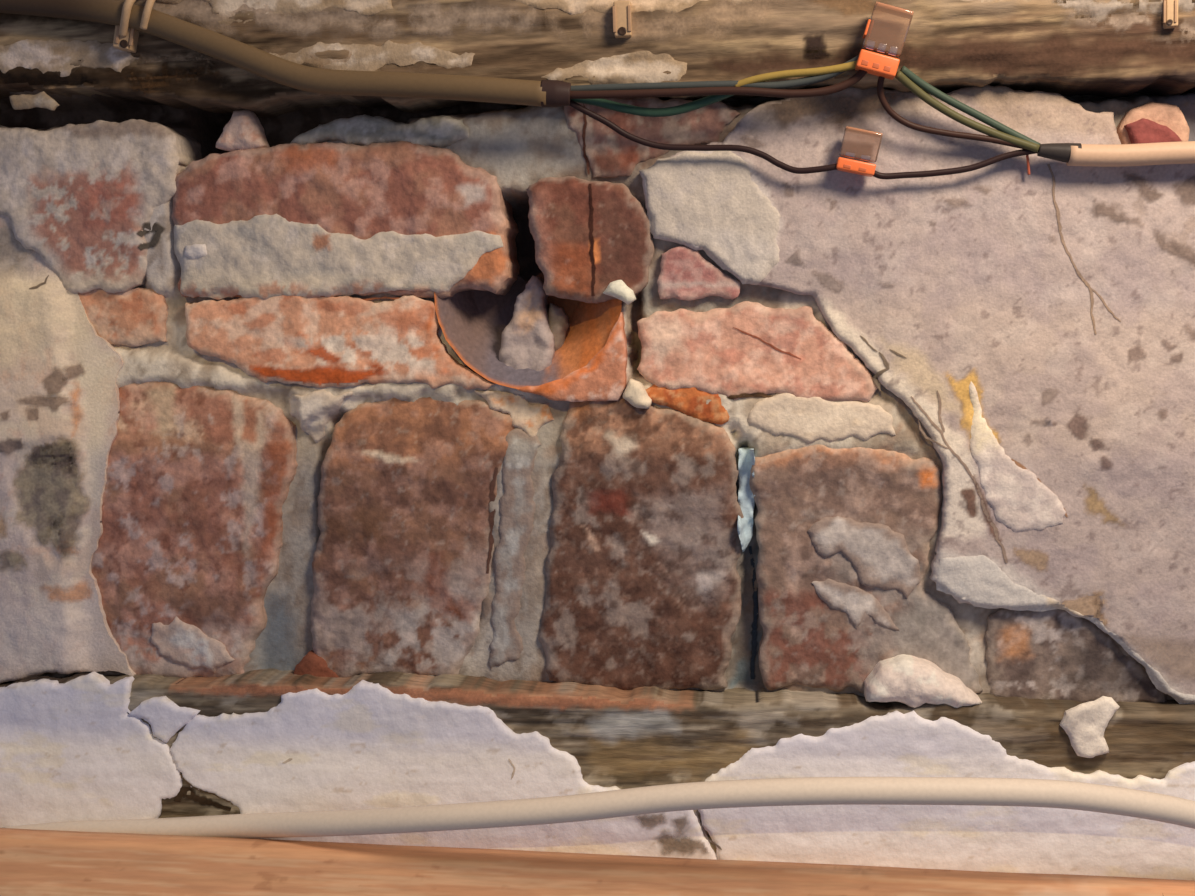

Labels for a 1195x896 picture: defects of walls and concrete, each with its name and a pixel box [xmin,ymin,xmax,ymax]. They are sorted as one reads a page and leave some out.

crack [582,104,596,296]
spalling [787,252,803,265]
spalling [815,273,842,292]
crack [1047,164,1121,334]
crack [860,335,907,391]
crack [911,390,1007,563]
peeling [1059,696,1120,758]
crack [174,769,233,811]